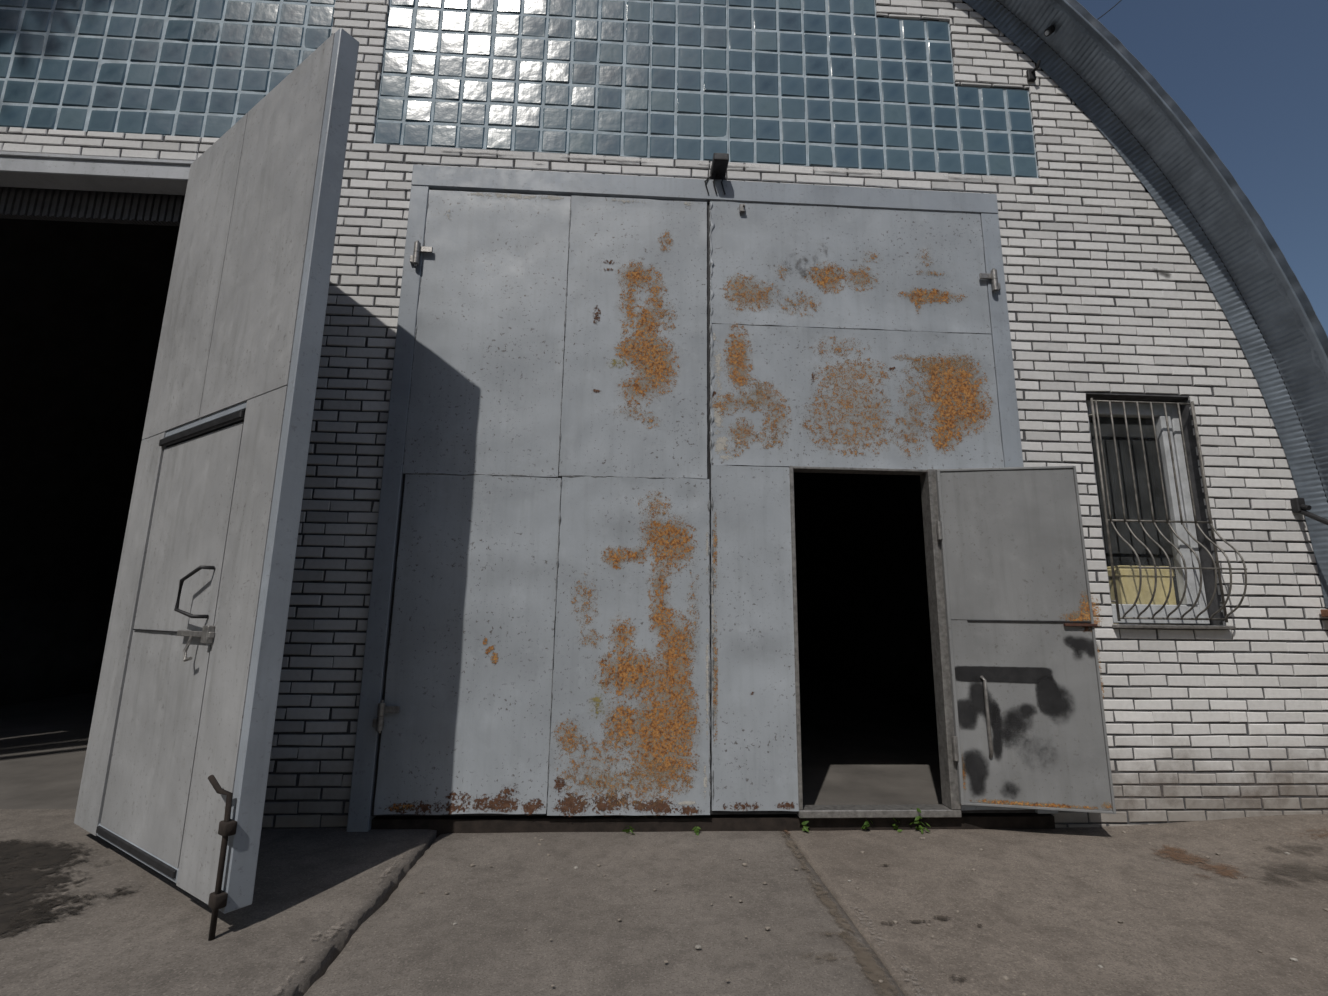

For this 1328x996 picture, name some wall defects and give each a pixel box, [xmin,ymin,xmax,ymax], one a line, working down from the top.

corrosion [603,260,679,429]
corrosion [712,250,992,456]
corrosion [385,491,718,817]